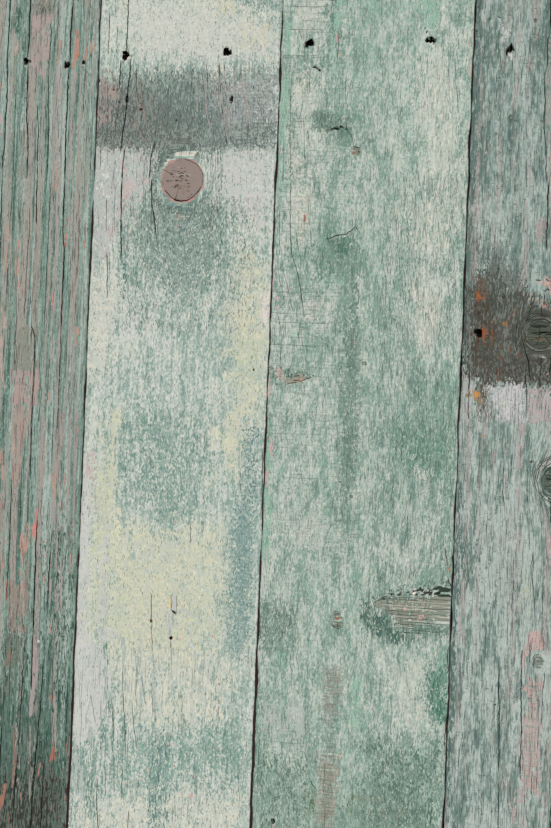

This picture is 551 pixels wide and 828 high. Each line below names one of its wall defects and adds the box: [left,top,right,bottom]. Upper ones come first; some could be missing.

leakage [72,27,96,69]
leakage [311,109,346,135]
leakage [462,0,551,423]
corrosion [473,275,515,367]
crack [86,390,137,456]
leakage [0,59,320,828]
crack [193,433,242,488]
crack [56,446,256,828]
crack [252,771,300,828]